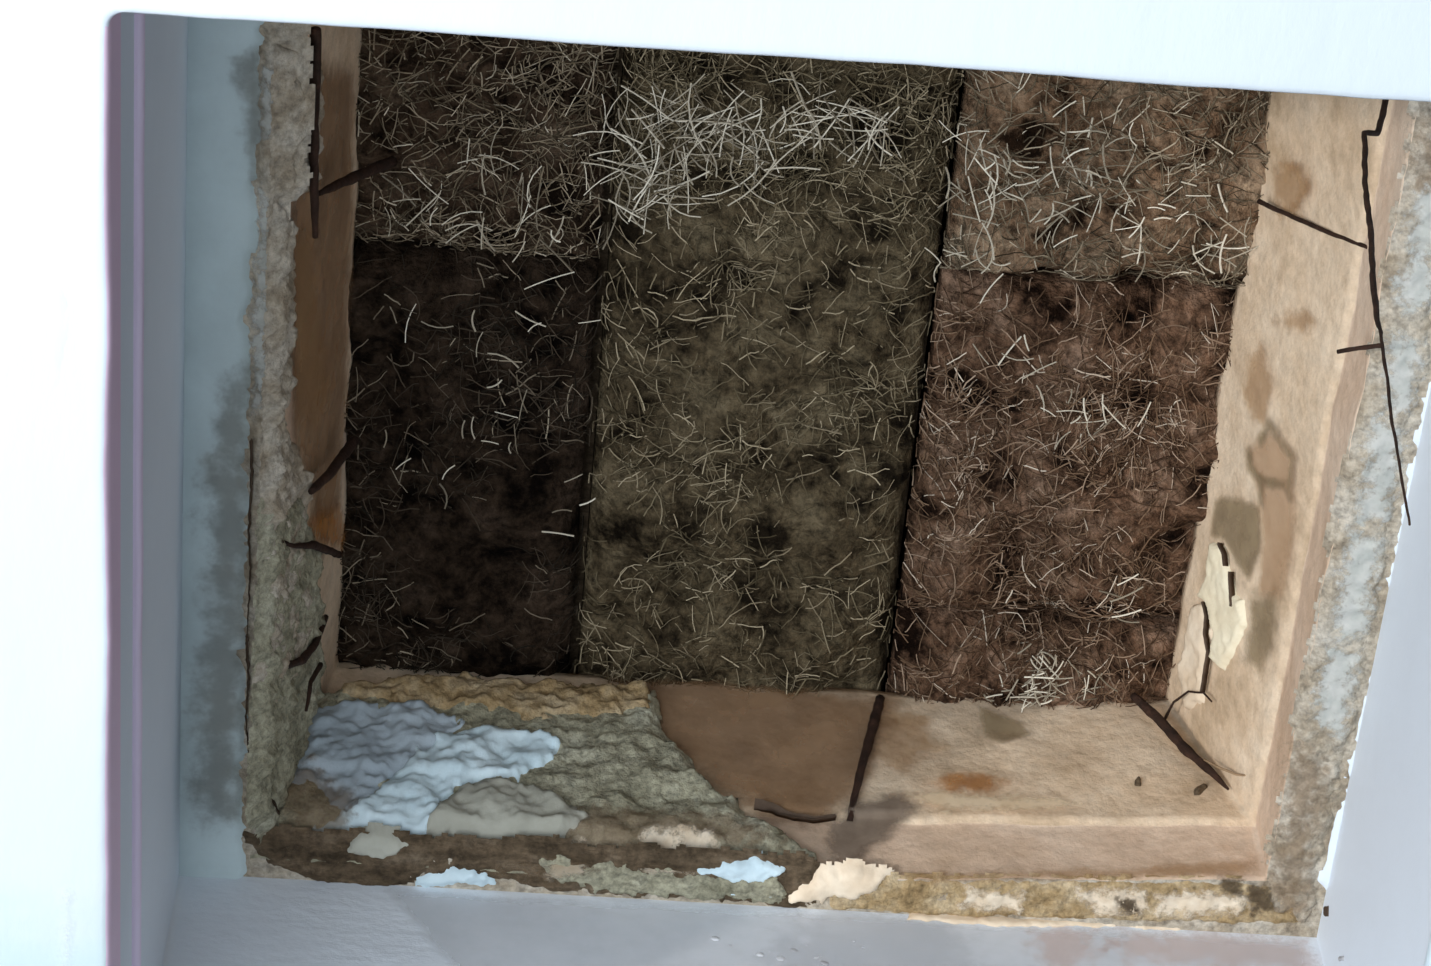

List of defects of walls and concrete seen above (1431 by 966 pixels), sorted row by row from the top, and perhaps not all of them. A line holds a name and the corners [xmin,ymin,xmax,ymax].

spalling [242,22,1431,931]